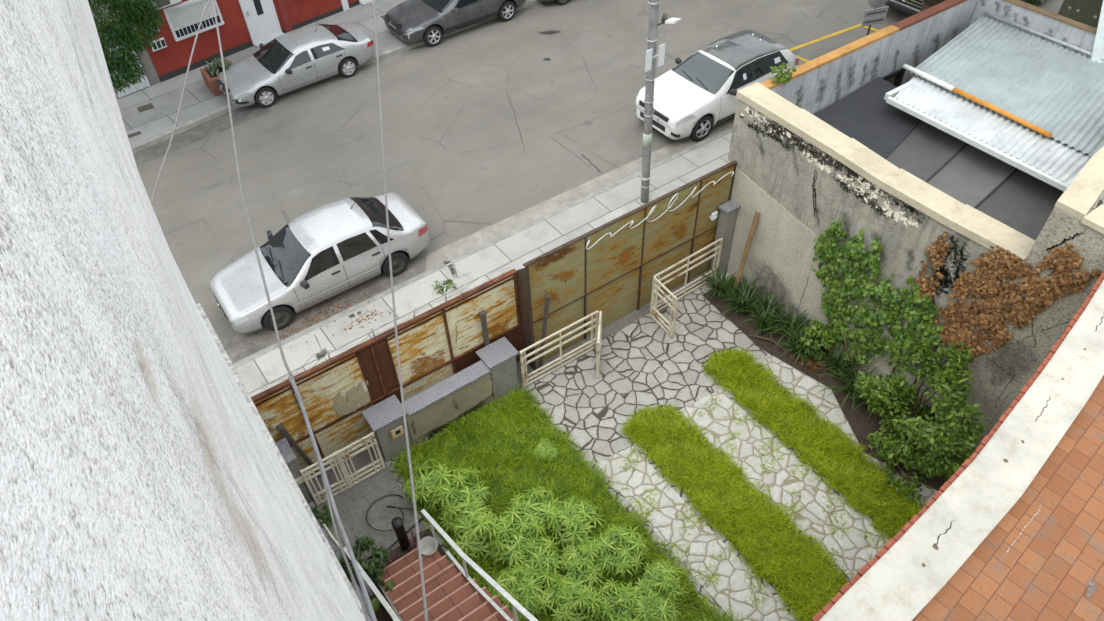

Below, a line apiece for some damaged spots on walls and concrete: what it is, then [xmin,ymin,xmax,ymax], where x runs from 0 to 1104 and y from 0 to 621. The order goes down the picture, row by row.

peeling [739,105,920,228]
corrosion [532,247,578,302]
corrosion [411,349,445,380]